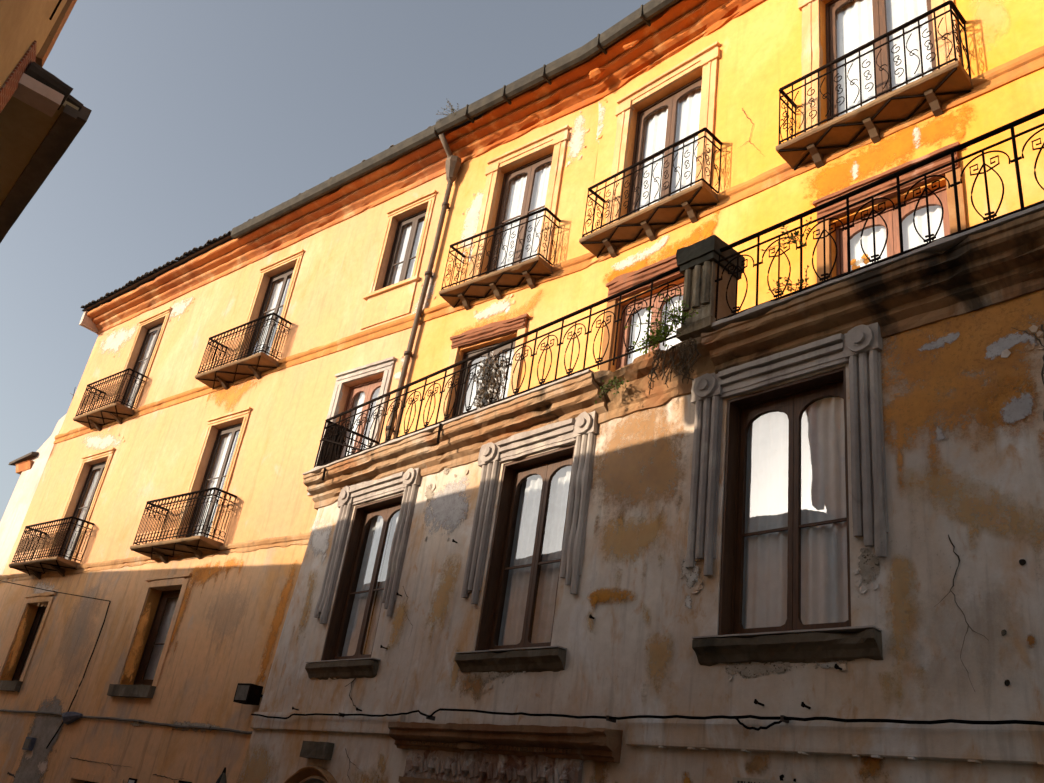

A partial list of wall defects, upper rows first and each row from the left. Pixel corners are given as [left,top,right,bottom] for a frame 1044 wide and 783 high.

peeling [565,99,607,167]
peeling [168,297,195,322]
peeling [99,323,138,357]
peeling [919,332,960,351]
peeling [984,325,1044,360]
crack [1011,324,1044,384]
damp [880,289,1044,544]
peeling [1000,393,1033,424]
peeling [85,427,125,450]
spalling [423,468,469,541]
crack [934,534,989,691]